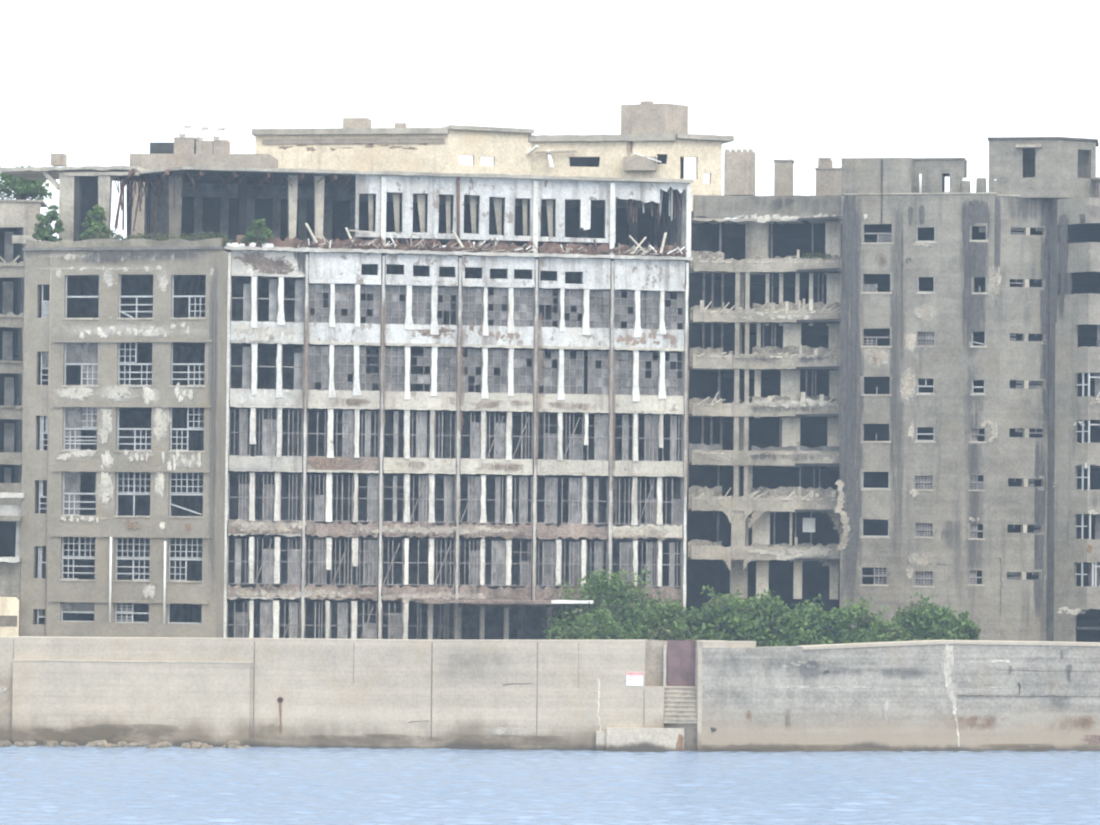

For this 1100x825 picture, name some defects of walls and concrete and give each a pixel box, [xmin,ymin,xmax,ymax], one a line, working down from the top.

peeling [56,383,202,504]
spalling [746,480,851,578]
crack [945,644,1100,747]